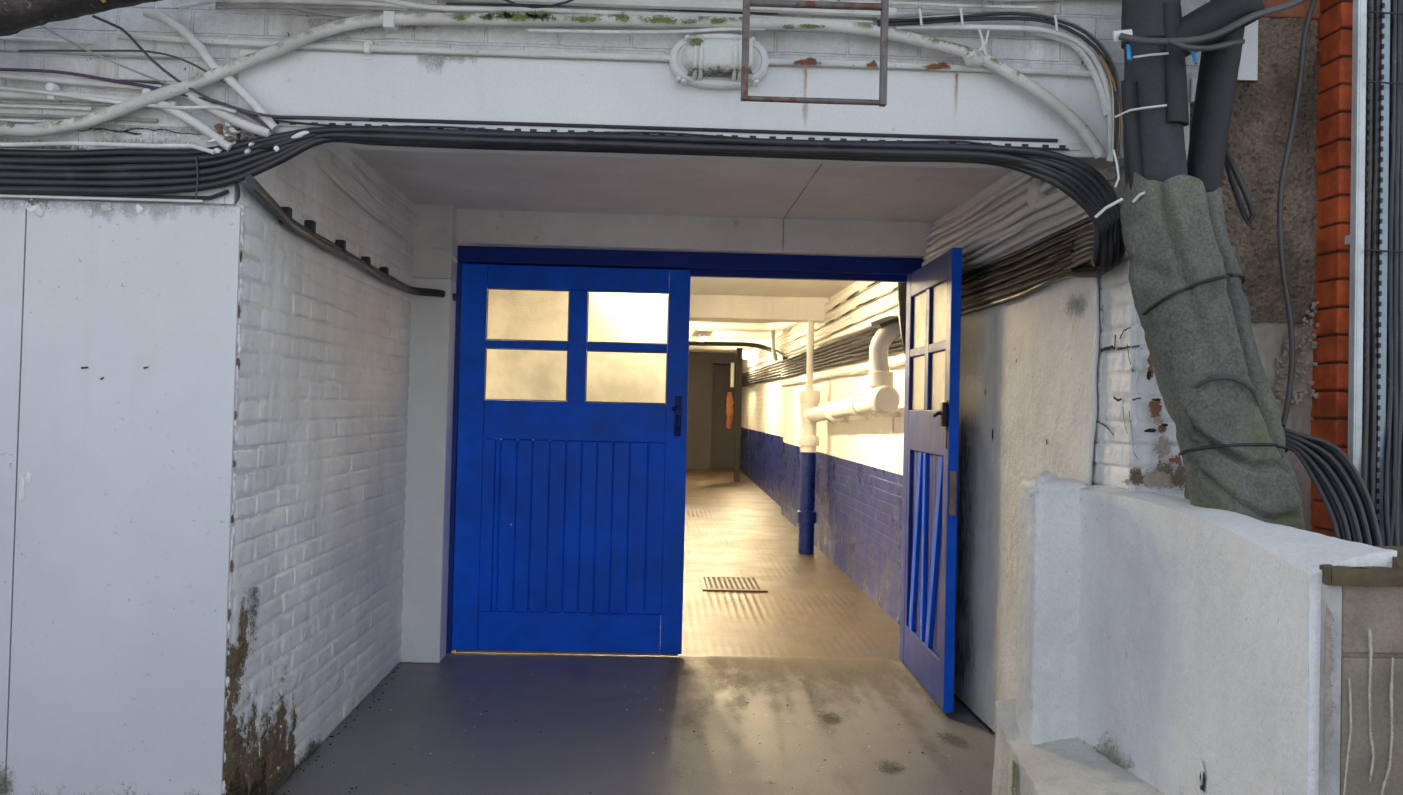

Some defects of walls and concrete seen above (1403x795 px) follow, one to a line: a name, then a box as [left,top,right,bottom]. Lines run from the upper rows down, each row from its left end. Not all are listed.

peeling [1251,301,1319,435]
spalling [1125,398,1190,500]
peeling [1285,450,1314,531]
mould [0,762,13,795]